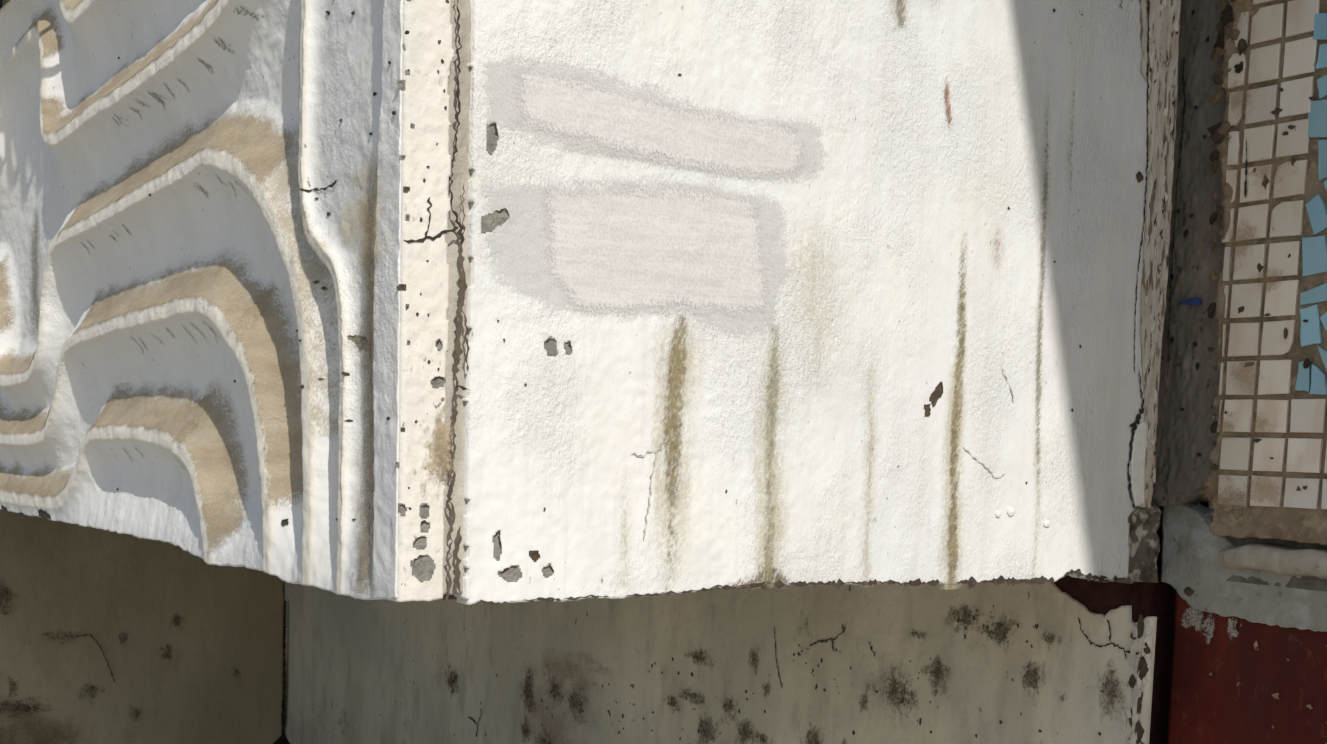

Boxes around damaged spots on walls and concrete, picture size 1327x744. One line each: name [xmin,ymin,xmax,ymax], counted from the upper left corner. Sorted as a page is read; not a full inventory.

spalling [1194,0,1247,110]
spalling [1203,121,1231,225]
crack [299,0,471,601]
peeling [1095,0,1195,584]
spalling [1208,303,1216,319]
crack [633,430,676,538]
damp [664,316,688,569]
damp [765,328,779,588]
damp [948,247,1054,644]
spalling [493,530,554,581]
damp [668,675,770,744]
damp [859,658,948,734]